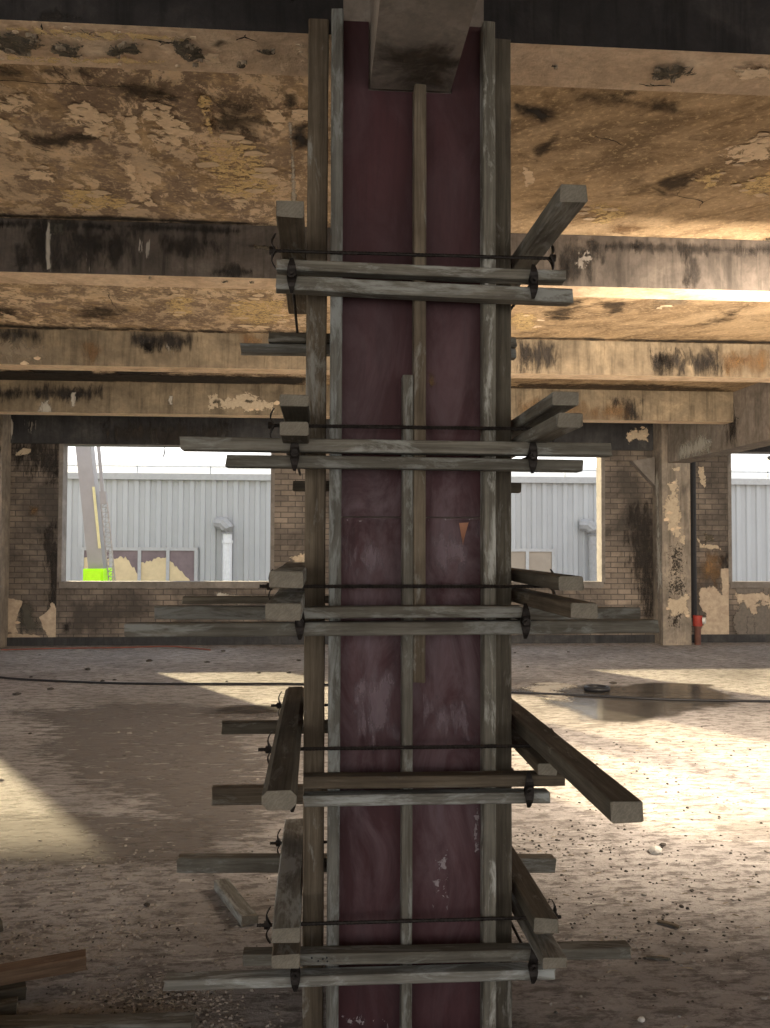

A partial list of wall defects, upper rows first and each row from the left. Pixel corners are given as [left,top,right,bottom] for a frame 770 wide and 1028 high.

peeling [0,93,35,142]
peeling [261,109,308,131]
peeling [21,161,157,211]
peeling [61,95,284,204]
peeling [691,132,770,197]
leakage [15,221,108,272]
leakage [652,353,673,374]
peeling [207,392,280,412]
peeling [626,426,649,442]
peeling [662,467,721,550]
peeling [666,590,690,618]